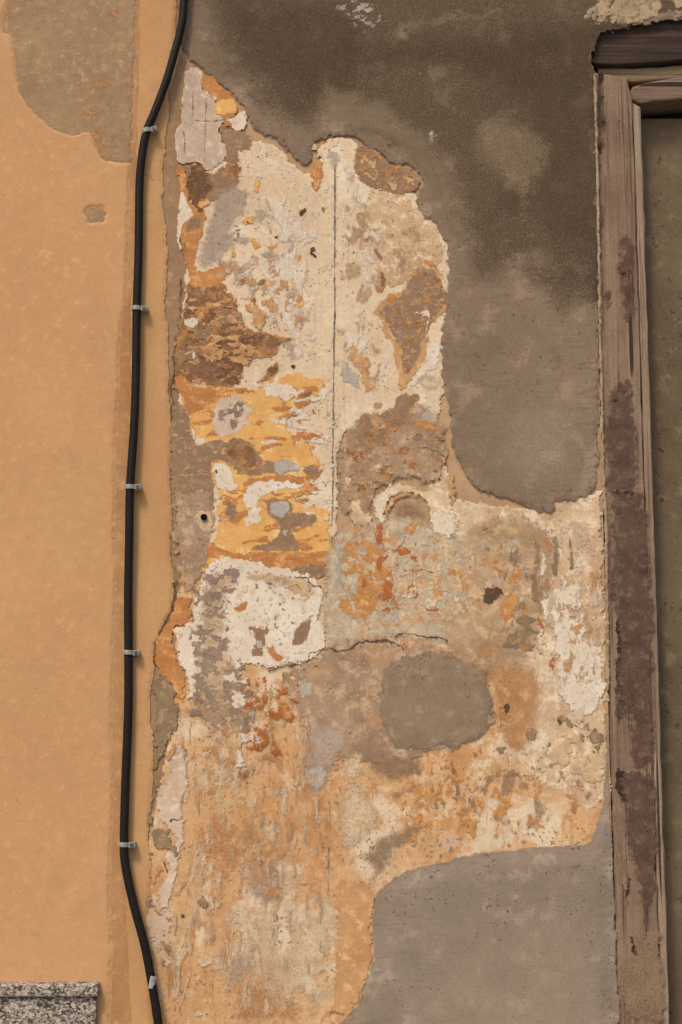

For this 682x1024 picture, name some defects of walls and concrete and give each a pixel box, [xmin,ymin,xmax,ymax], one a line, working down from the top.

flaking render [2,0,136,163]
flaking render [146,67,662,1024]
crack [266,633,448,672]